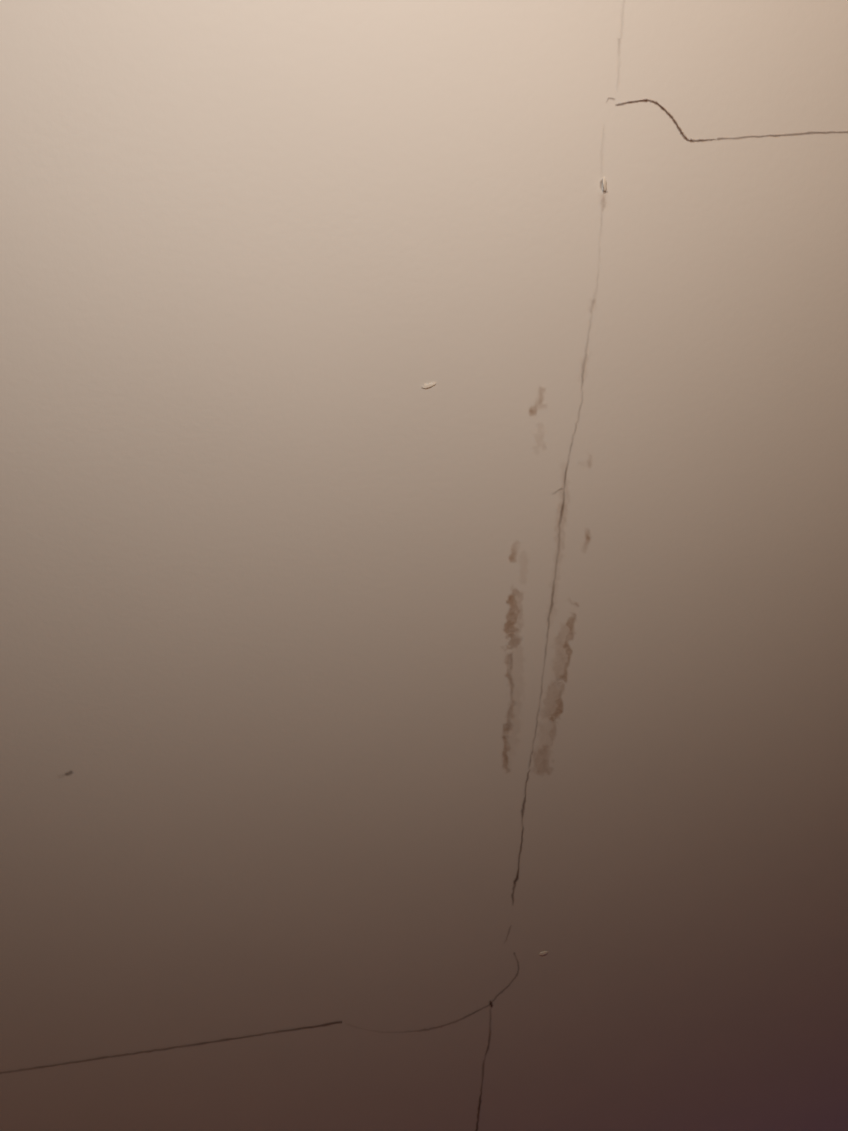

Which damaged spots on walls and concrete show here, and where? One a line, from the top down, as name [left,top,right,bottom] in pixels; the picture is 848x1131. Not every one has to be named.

crack [618,99,714,141]